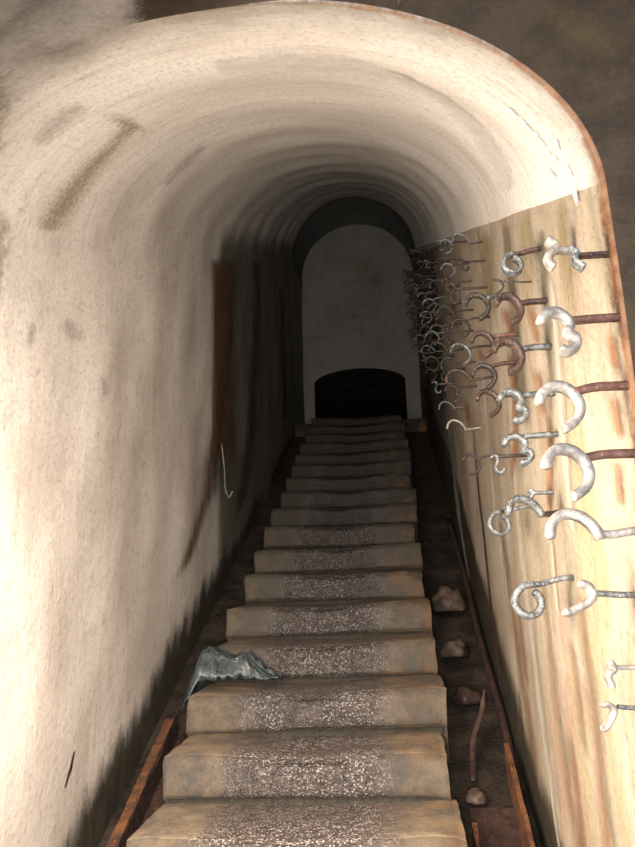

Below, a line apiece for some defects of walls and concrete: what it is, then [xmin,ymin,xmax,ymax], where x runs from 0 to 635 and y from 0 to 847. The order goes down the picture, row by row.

corrosion [508,58,635,443]